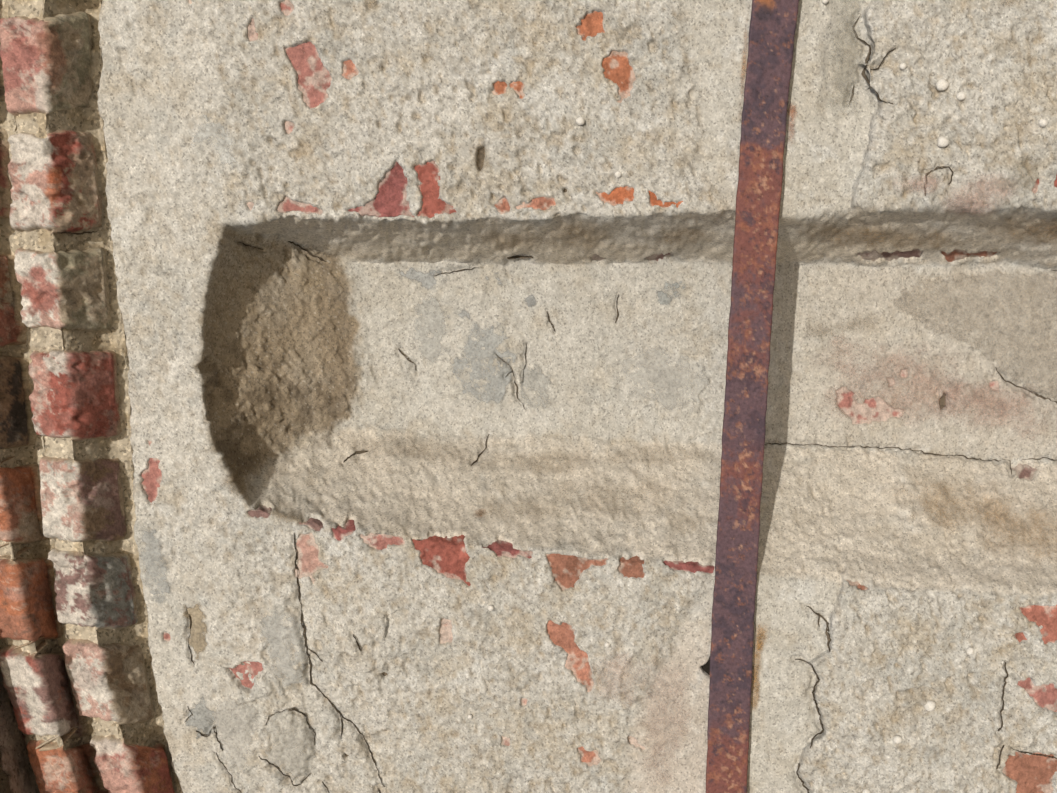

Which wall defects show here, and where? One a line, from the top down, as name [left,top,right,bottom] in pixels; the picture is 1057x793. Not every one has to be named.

crack [849,16,897,104]
flaking render [348,161,456,218]
crack [765,443,1057,475]
flaking render [295,518,471,586]
flaking render [546,553,645,591]
flaking render [1014,605,1057,644]
crack [294,534,385,793]
flaking render [547,620,594,692]
crack [184,706,241,793]
crack [265,707,316,743]
crack [258,756,329,793]
flaking render [1002,752,1057,793]